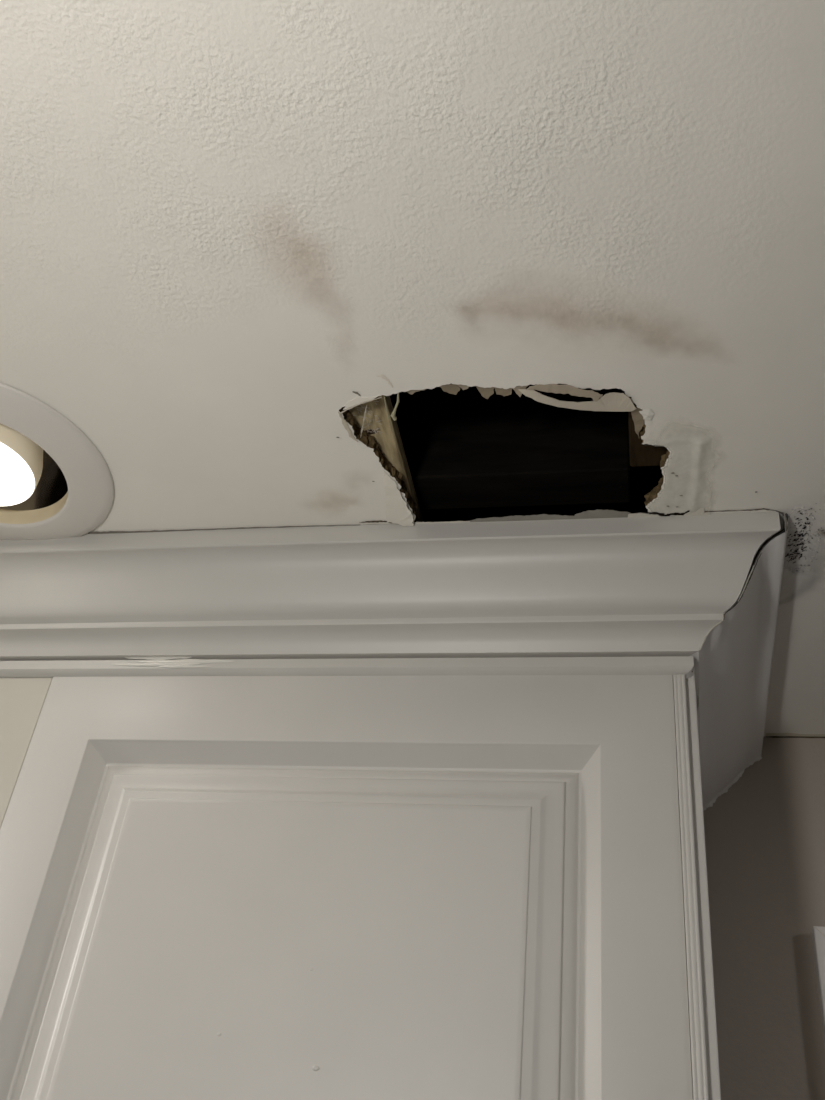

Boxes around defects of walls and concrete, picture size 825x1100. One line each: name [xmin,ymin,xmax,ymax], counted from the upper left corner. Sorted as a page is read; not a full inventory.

peeling [440,384,603,402]
peeling [338,397,381,442]
peeling [631,408,644,437]
leakage [785,503,825,572]